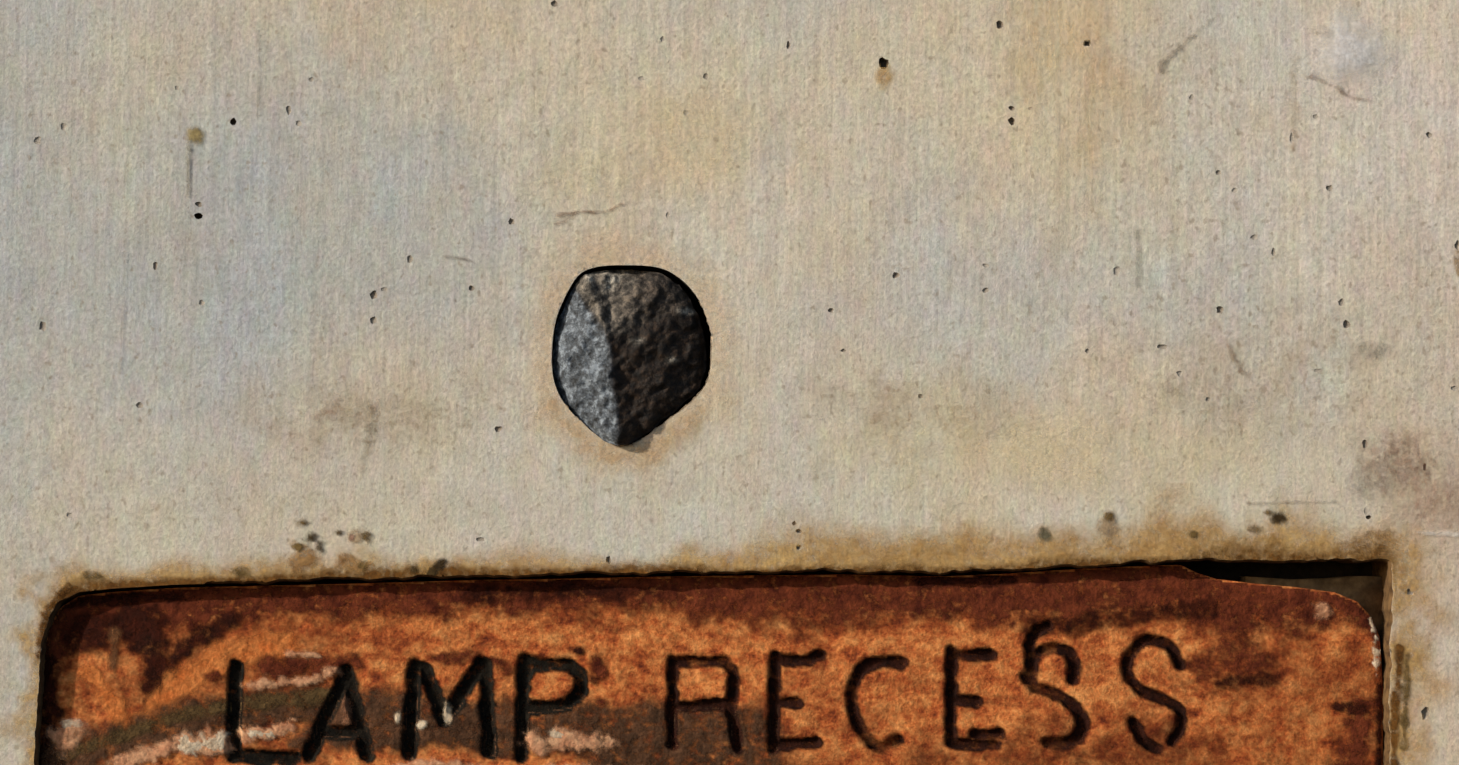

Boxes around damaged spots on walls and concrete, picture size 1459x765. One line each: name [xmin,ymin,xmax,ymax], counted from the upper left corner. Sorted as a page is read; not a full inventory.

corrosion [17,510,1425,765]